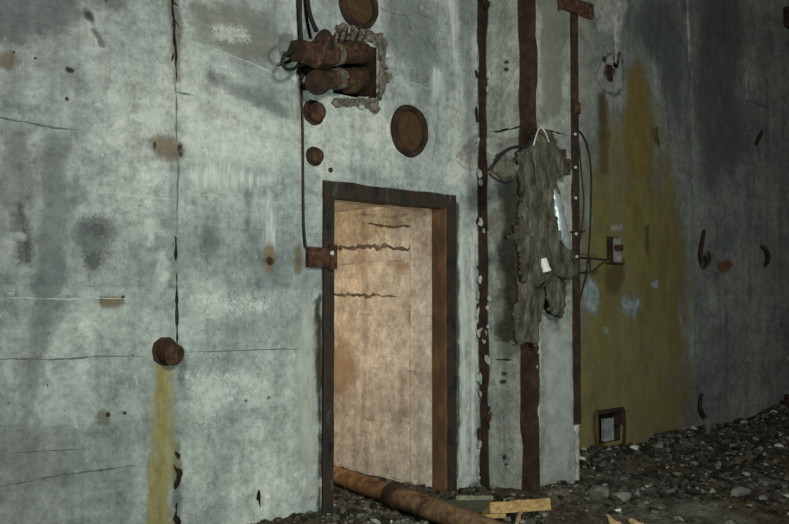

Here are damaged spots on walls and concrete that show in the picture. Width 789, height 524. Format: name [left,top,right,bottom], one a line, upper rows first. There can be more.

spalling [331,23,393,114]
leakage [578,15,590,143]
corrosion [150,137,184,160]
crack [171,0,193,344]
corrosion [264,242,276,270]
crack [334,291,396,299]
crack [334,223,411,251]
peeling [475,295,491,344]
leakage [545,68,711,478]
crack [0,353,146,361]
leakage [180,365,272,433]
leakage [148,366,172,524]